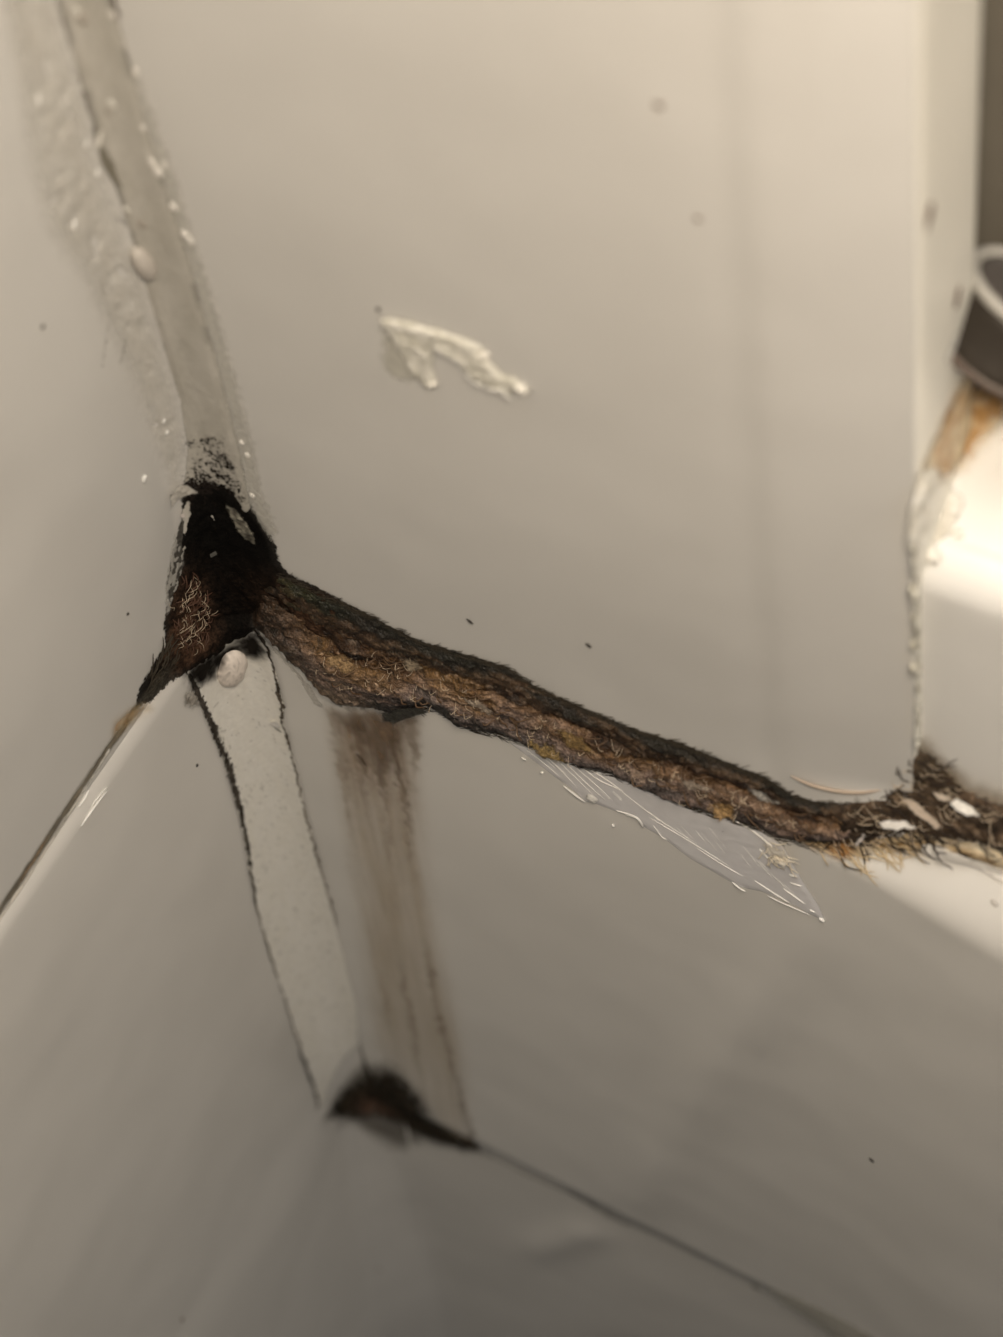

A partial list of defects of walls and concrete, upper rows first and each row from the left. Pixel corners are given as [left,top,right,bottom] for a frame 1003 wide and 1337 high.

crack [186,674,319,1110]
crack [253,629,337,925]